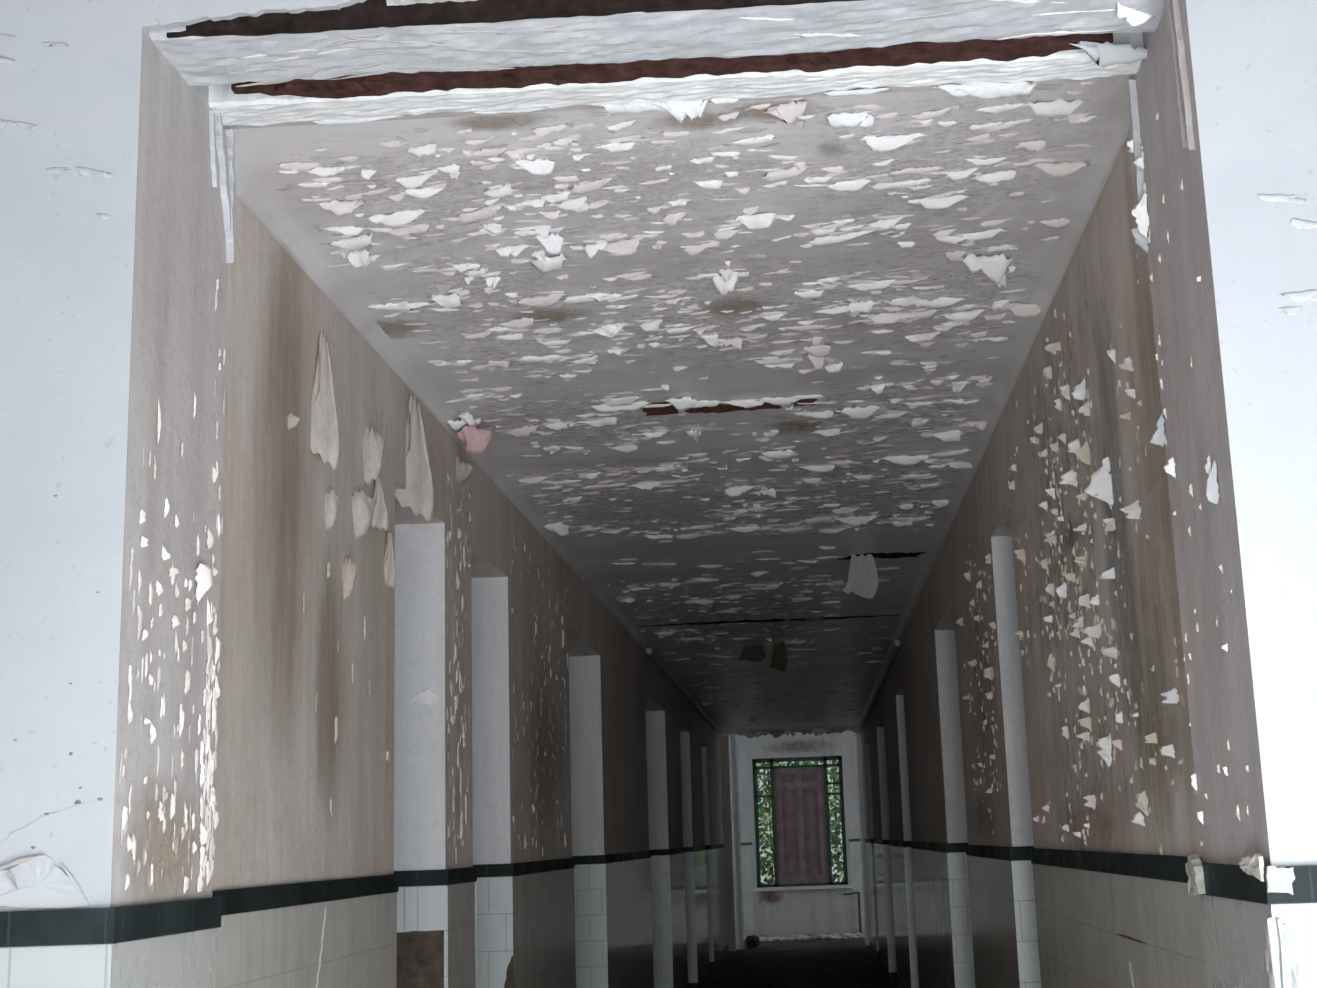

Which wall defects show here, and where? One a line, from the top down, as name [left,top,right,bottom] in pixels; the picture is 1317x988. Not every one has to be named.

peeling [209,110,237,263]
peeling [143,398,162,479]
peeling [215,348,226,439]
peeling [224,0,1208,863]
peeling [1189,454,1220,511]
peeling [119,463,223,894]
crack [0,798,103,843]
spalling [397,930,444,988]
spalling [504,956,514,988]
crack [1117,934,1146,988]